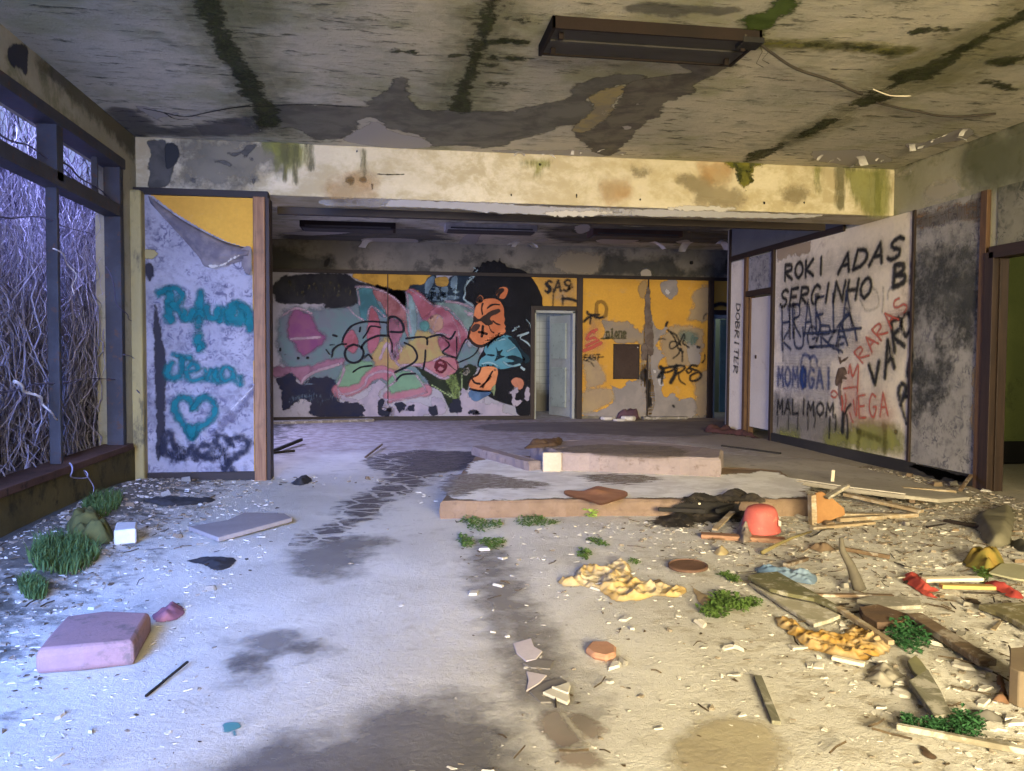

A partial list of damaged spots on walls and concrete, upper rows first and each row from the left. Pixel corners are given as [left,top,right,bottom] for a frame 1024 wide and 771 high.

water stain [804,43,897,55]
water stain [849,8,1024,107]
water stain [37,0,740,189]
water stain [678,175,743,207]
water stain [785,189,805,202]
water stain [836,167,890,216]
peeling [641,269,678,299]
peeling [582,285,708,418]
water stain [407,451,476,473]
water stain [293,536,384,577]